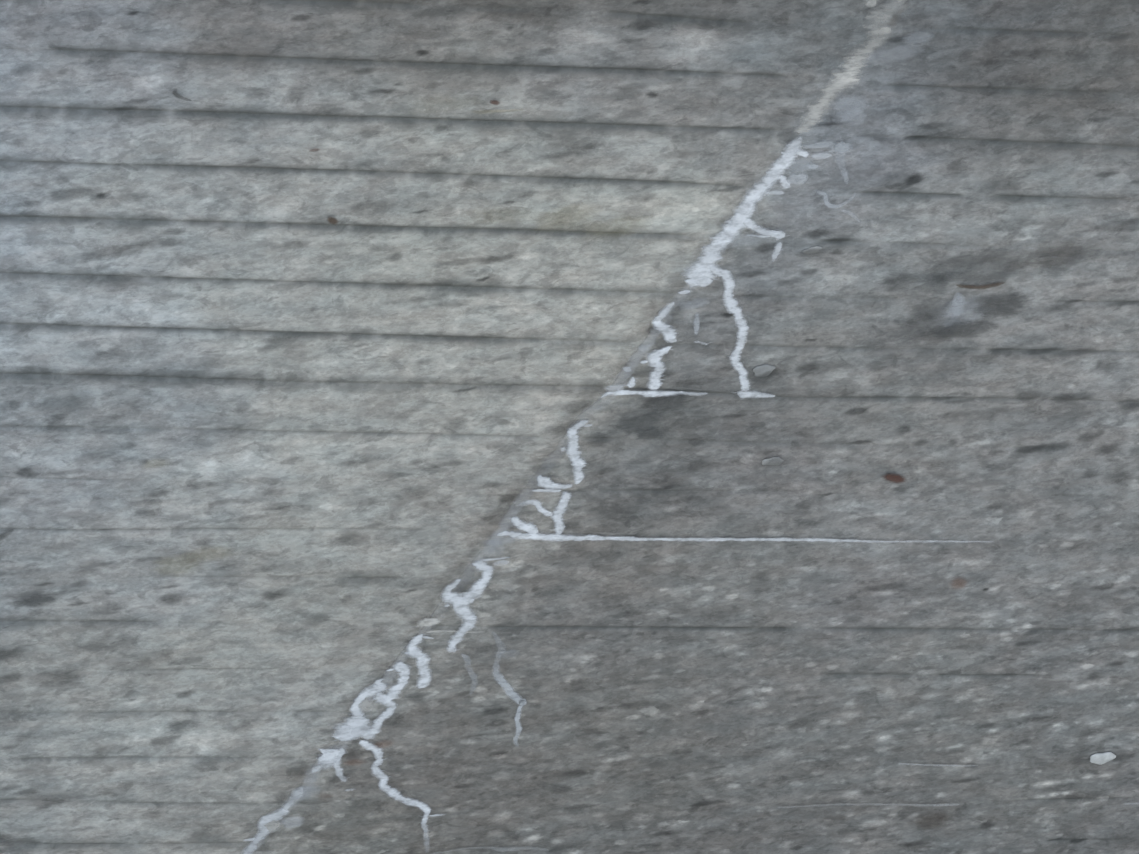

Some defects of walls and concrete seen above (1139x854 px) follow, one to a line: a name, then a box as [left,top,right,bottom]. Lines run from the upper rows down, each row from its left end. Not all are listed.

damp [601,47,871,398]
damp [498,421,859,542]
efflorescence [442,559,495,651]
efflorescence [313,618,440,825]
damp [494,672,526,733]
damp [245,808,288,848]